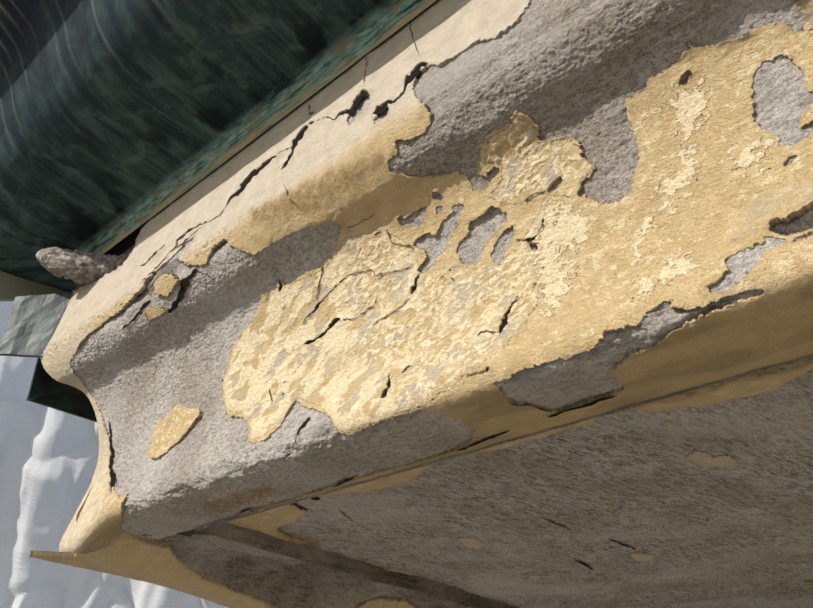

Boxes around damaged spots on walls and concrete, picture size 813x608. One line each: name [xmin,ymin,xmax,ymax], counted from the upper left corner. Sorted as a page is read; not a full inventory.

crack [140,21,428,279]
spalling [348,95,371,125]
spalling [388,0,813,318]
crack [122,268,214,330]
crack [302,264,419,345]
crack [477,296,518,337]
spalling [494,208,813,410]
spalling [70,220,473,608]
crack [381,366,412,398]
crack [109,423,117,492]